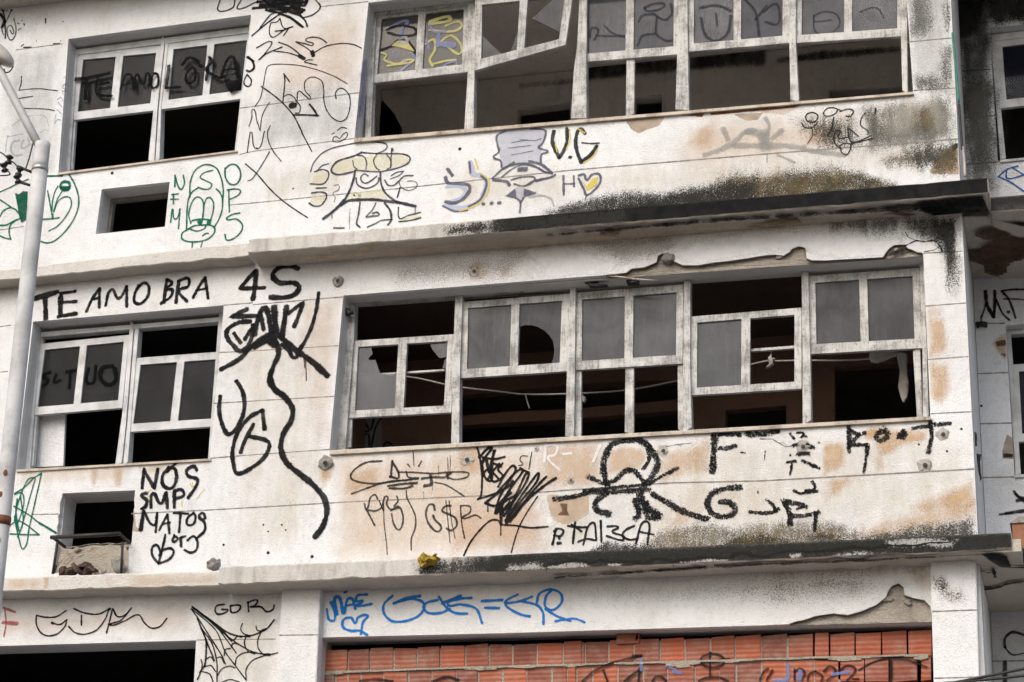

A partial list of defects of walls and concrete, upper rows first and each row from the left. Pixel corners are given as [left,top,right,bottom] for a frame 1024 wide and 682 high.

peeling [611,117,664,133]
peeling [682,105,799,121]
damp [438,0,1024,299]
spalling [607,246,824,278]
spalling [883,244,923,259]
peeling [968,221,1024,276]
damp [413,519,1024,579]
spalling [790,583,932,626]